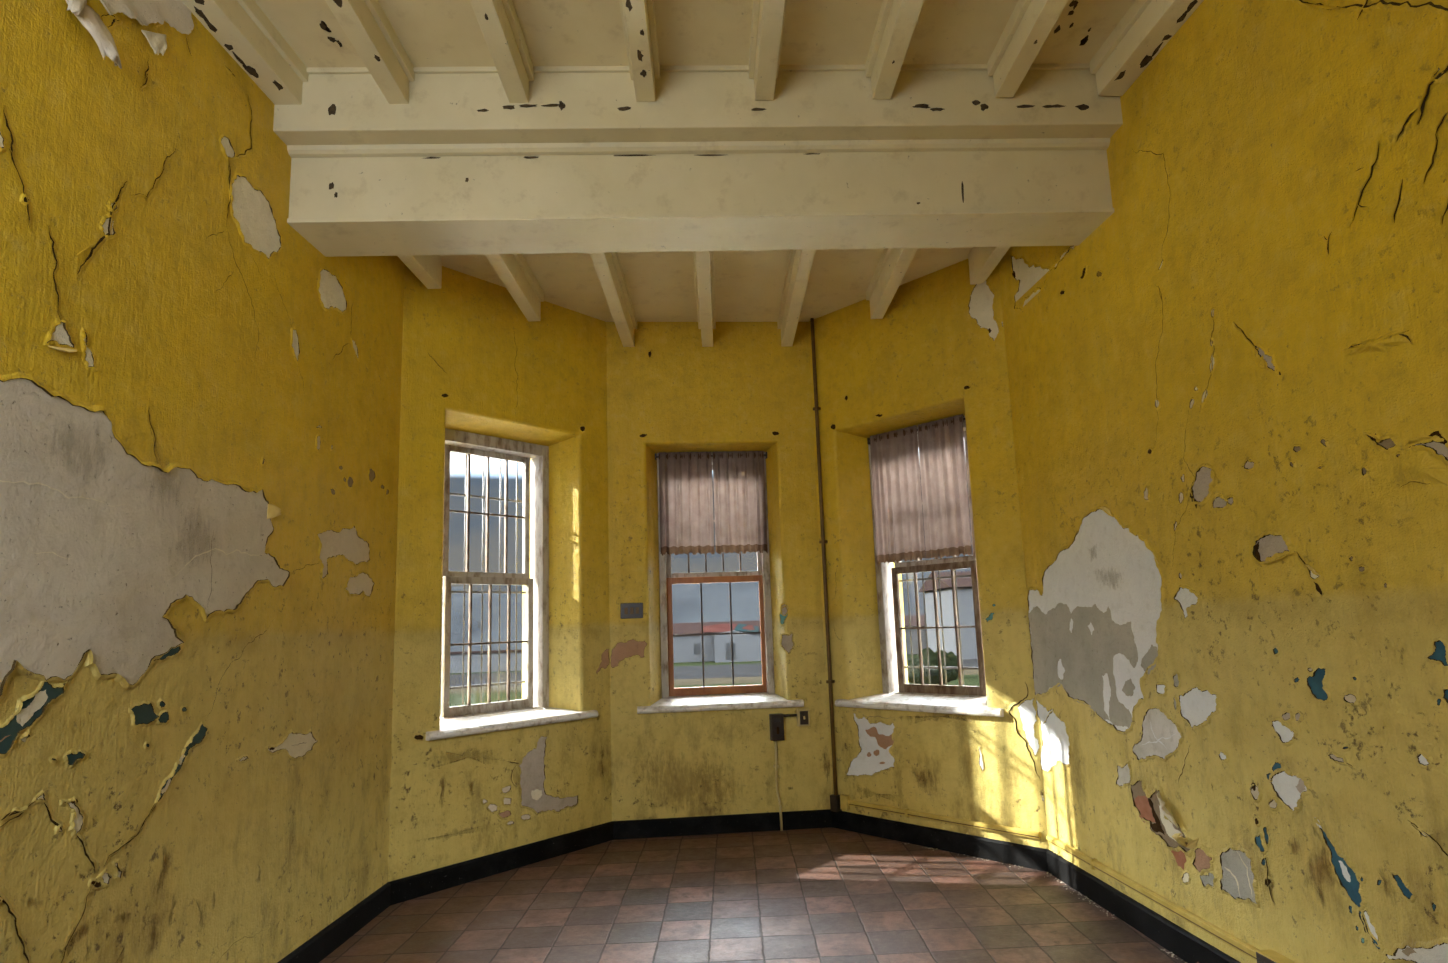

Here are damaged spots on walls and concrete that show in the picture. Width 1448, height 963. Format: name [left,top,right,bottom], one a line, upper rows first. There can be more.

peeling [65,0,283,91]
crack [1283,0,1448,20]
crack [1323,61,1448,255]
crack [43,148,177,353]
peeling [208,95,304,388]
peeling [317,267,347,314]
peeling [967,246,1076,343]
spalling [0,372,375,963]
peeling [481,734,579,826]
peeling [844,711,897,779]
peeling [1027,506,1448,963]
crack [1407,819,1448,859]